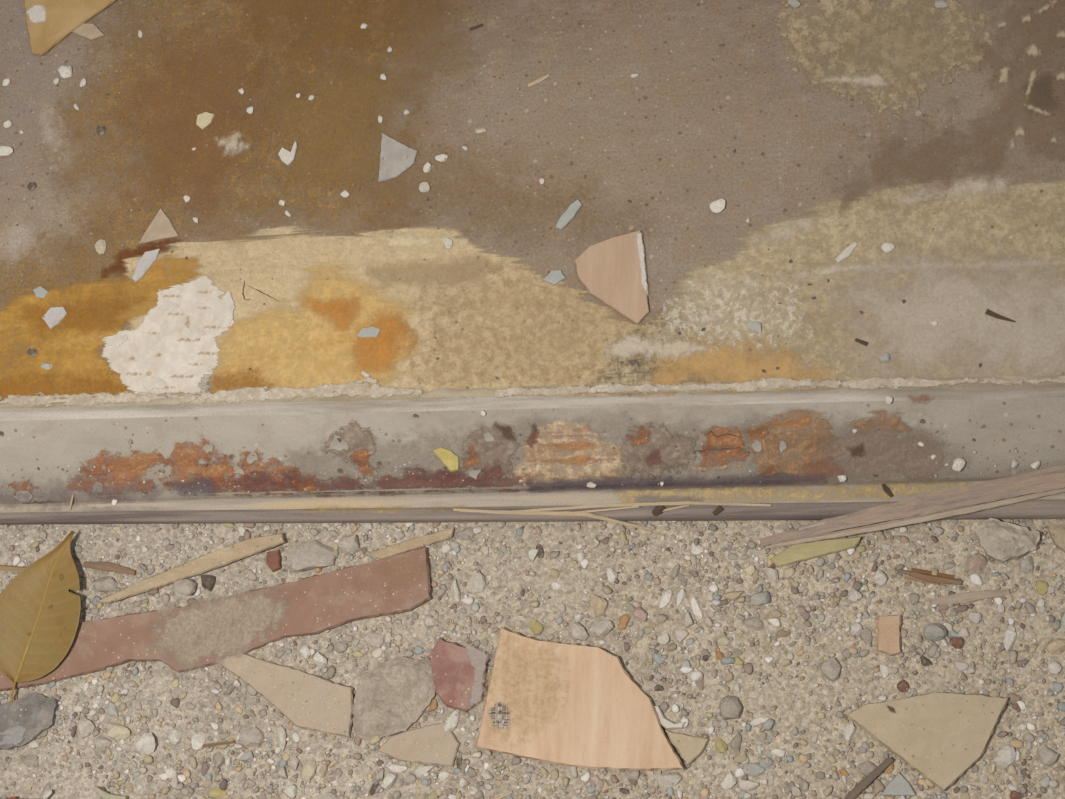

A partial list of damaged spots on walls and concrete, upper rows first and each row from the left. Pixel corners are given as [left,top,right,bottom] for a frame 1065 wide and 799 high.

peeling [777,0,993,119]
peeling [102,177,1065,398]